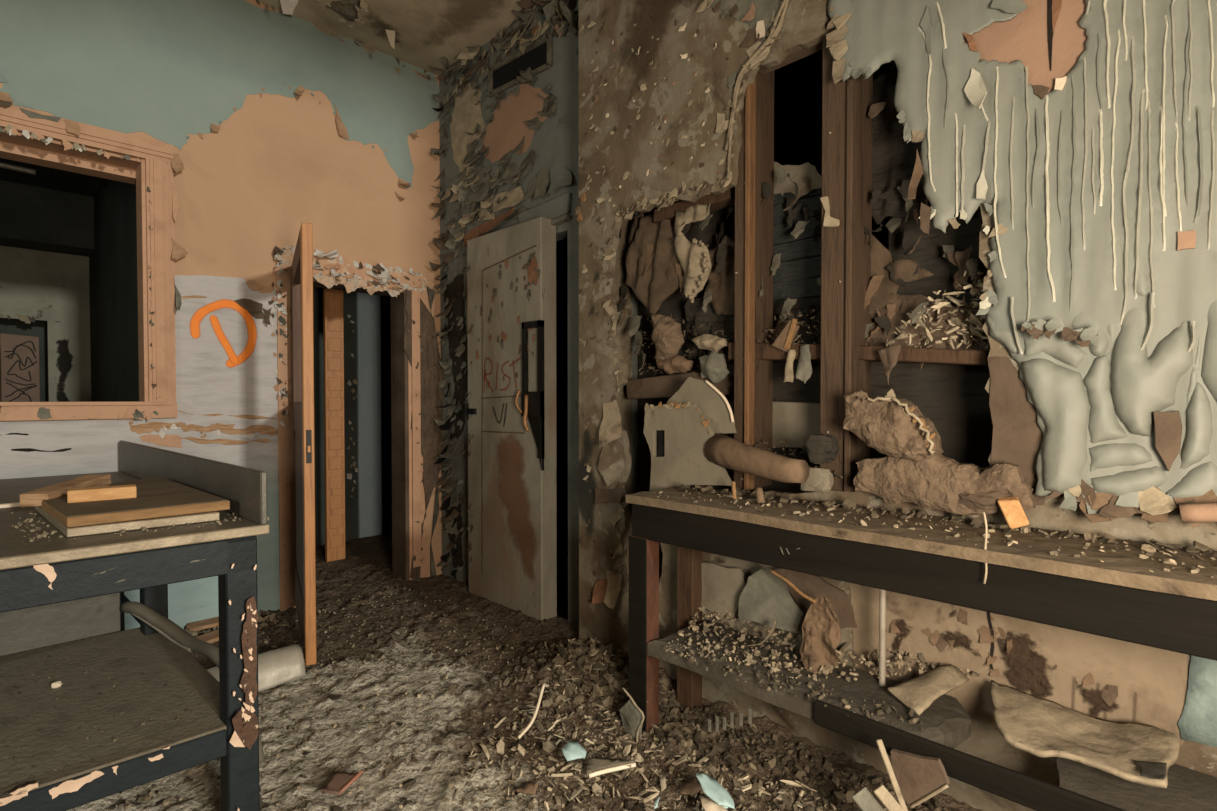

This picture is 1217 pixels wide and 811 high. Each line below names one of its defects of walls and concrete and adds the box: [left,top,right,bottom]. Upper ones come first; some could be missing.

peeling [695,0,789,180]
crack [1047,0,1062,71]
peeling [0,0,629,610]
peeling [826,0,1217,523]
peeling [0,765,118,806]